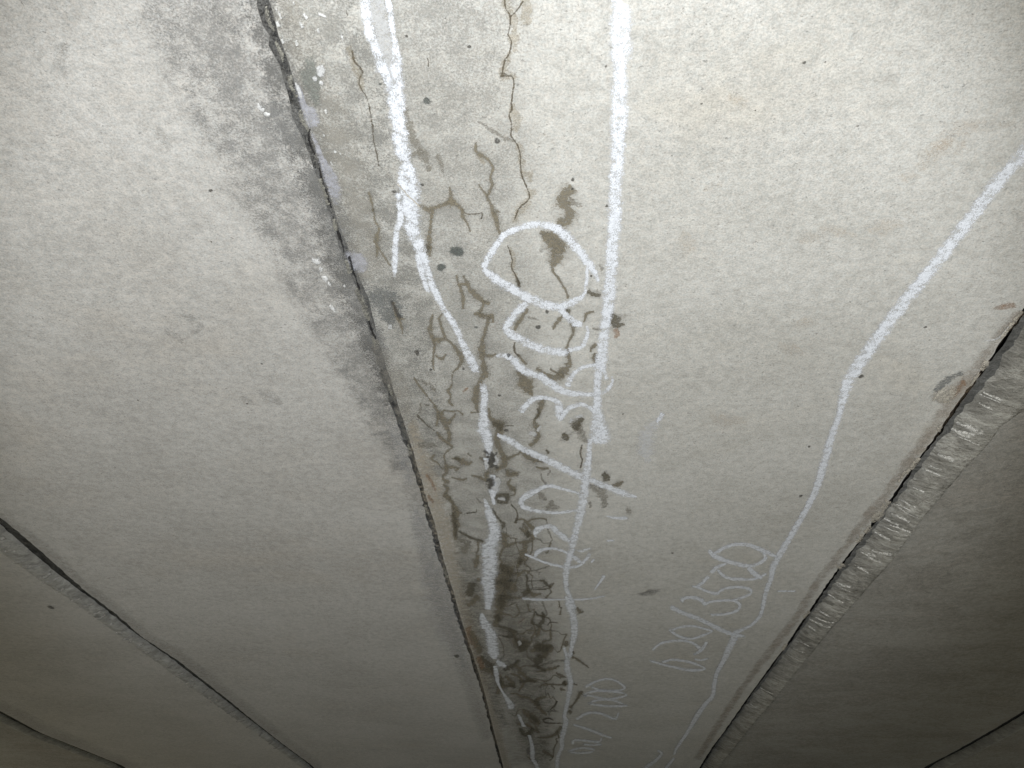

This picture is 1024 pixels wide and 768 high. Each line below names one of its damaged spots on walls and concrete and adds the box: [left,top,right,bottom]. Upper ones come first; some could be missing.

crack [351,51,379,166]
leakage [247,0,393,402]
leakage [540,184,578,299]
leakage [610,314,625,334]
crack [393,0,594,762]
leakage [516,369,534,396]
spalling [931,361,989,403]
leakage [561,415,586,467]
leakage [590,472,624,507]
leakage [466,564,518,627]
leakage [512,637,569,672]